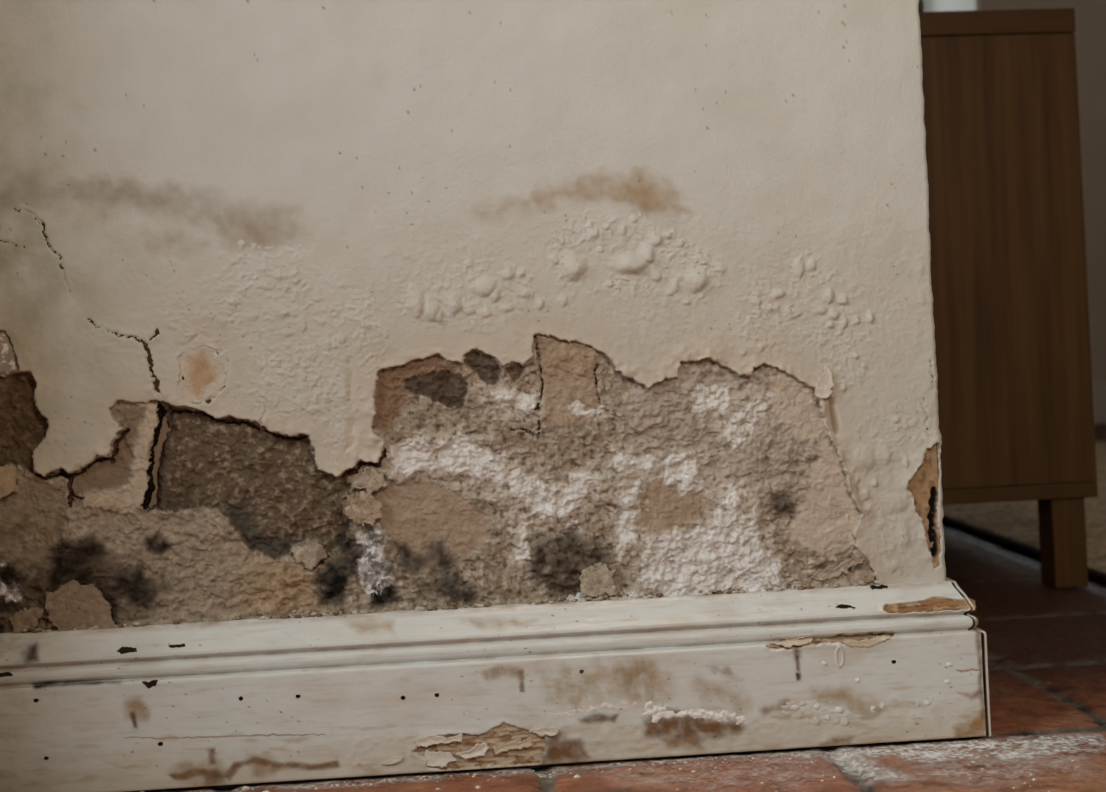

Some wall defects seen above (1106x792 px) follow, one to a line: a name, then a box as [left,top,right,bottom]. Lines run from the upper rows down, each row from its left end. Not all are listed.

crack [0,208,64,269]
efflorescence [491,386,537,415]
efflorescence [558,399,604,420]
efflorescence [688,382,786,452]
spalling [0,331,888,633]
damp [385,426,792,602]
peeling [907,444,941,568]
damp [0,562,31,608]
mould [147,538,171,553]
damp [317,522,420,605]
peeling [884,597,976,614]
peeling [415,727,559,768]